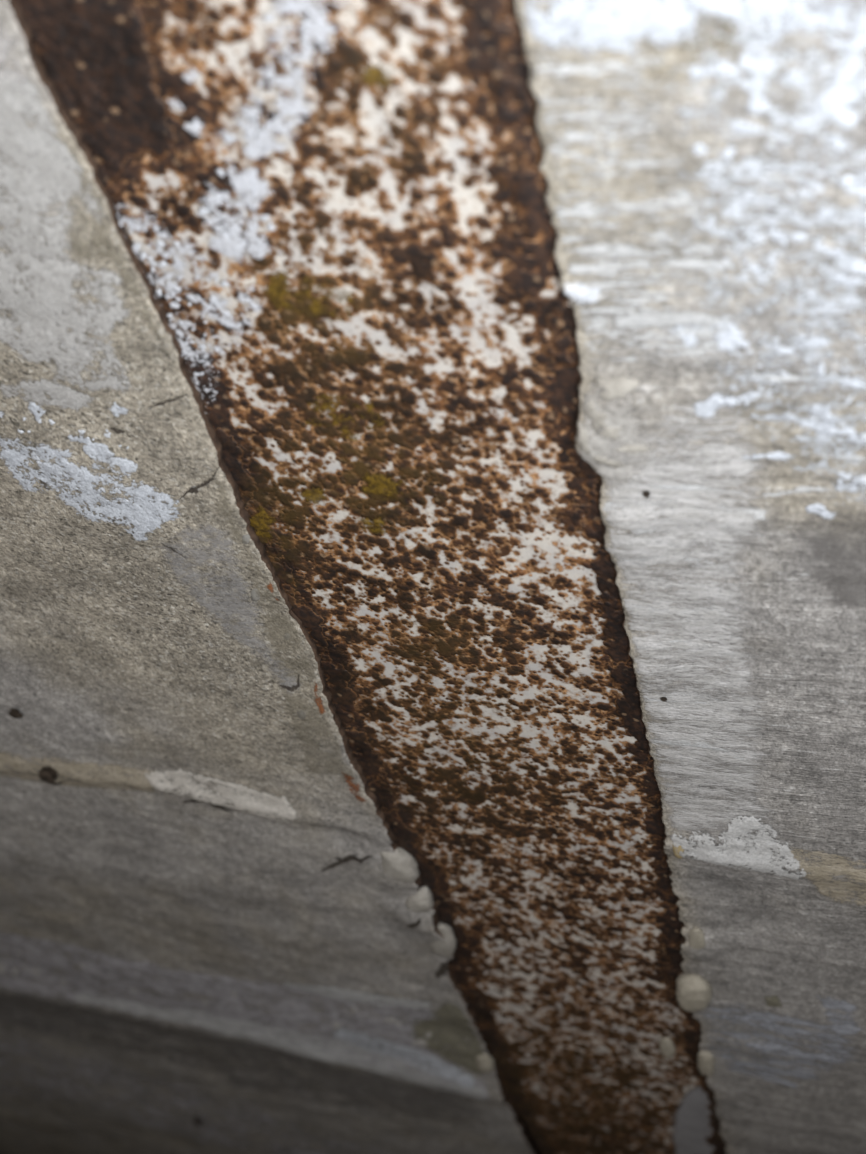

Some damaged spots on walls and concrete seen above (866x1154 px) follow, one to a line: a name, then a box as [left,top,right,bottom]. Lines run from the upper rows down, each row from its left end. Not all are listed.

water stain [534,49,738,368]
water stain [743,374,815,383]
efflorescence [0,402,180,541]
water stain [760,486,838,498]
corrosion [160,0,728,1154]
crack [321,855,372,872]
efflorescence [670,815,806,880]
crack [407,919,421,928]
crack [435,963,449,978]
crack [515,1110,541,1154]